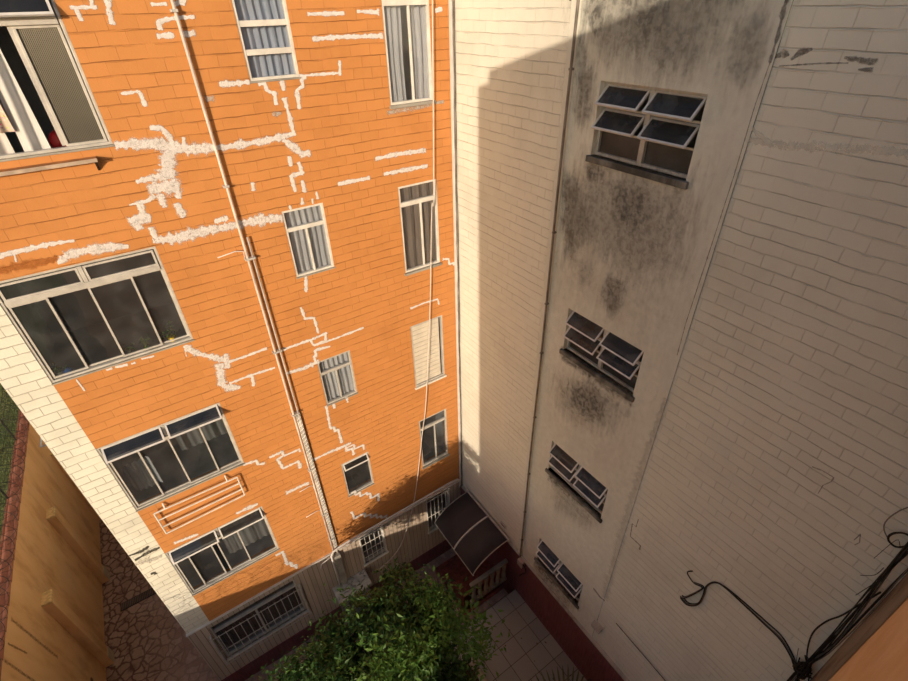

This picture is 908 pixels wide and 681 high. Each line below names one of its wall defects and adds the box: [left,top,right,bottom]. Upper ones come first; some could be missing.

crack [150,0,196,39]
crack [0,9,428,264]
crack [183,276,364,392]
crack [243,397,365,495]
crack [236,503,258,514]
crack [350,491,388,519]